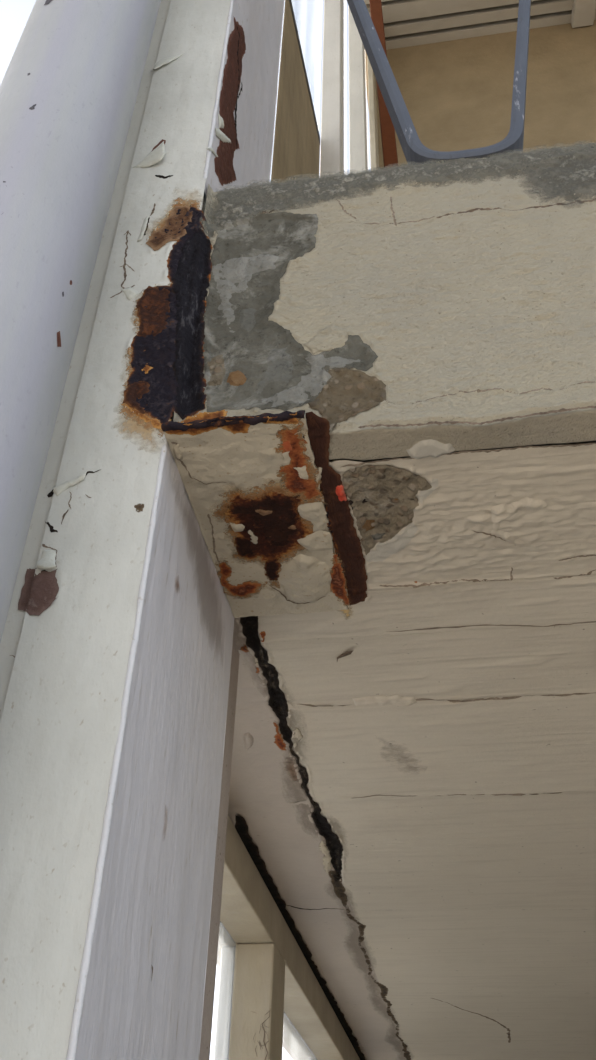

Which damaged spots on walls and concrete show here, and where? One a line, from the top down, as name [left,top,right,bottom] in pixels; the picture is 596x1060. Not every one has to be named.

spalling [203,212,386,432]
rust [117,197,368,617]
peeling [407,439,455,459]
spalling [343,465,438,562]
peeling [18,544,59,616]
crack [416,693,591,703]
crack [240,616,411,1060]
crack [439,790,563,798]